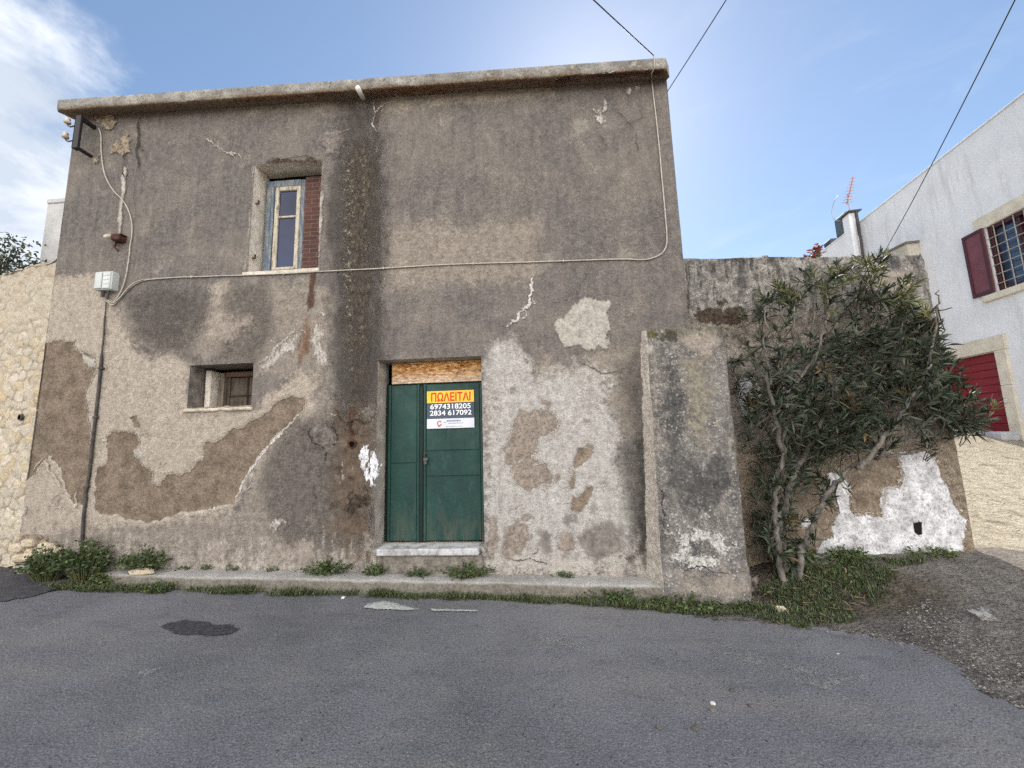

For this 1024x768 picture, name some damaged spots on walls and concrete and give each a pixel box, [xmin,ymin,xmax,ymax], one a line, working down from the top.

flaking render [93,115,132,175]
rust [307,272,315,308]
damp [328,108,382,561]
crack [507,275,535,327]
flaking render [25,339,307,524]
peeling [330,445,382,520]
flaking render [501,399,605,513]
peeling [735,377,762,420]
peeling [786,451,967,559]
damp [266,539,314,565]